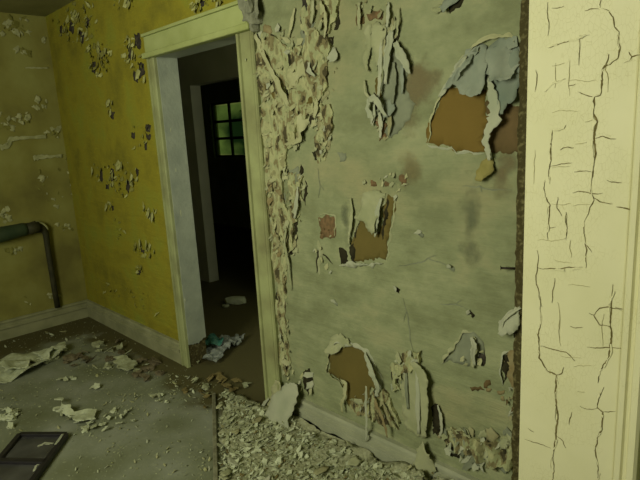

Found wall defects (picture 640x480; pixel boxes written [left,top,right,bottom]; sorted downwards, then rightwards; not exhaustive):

peeling [52,1,112,77]
peeling [121,33,145,83]
peeling [426,87,519,154]
peeling [91,160,139,198]
peeling [253,0,340,395]
peeling [351,172,408,262]
crack [525,0,637,480]
peeling [328,346,386,421]
spalling [442,330,486,368]
spalling [499,350,514,420]
peeling [498,306,522,338]
peeling [437,425,513,474]